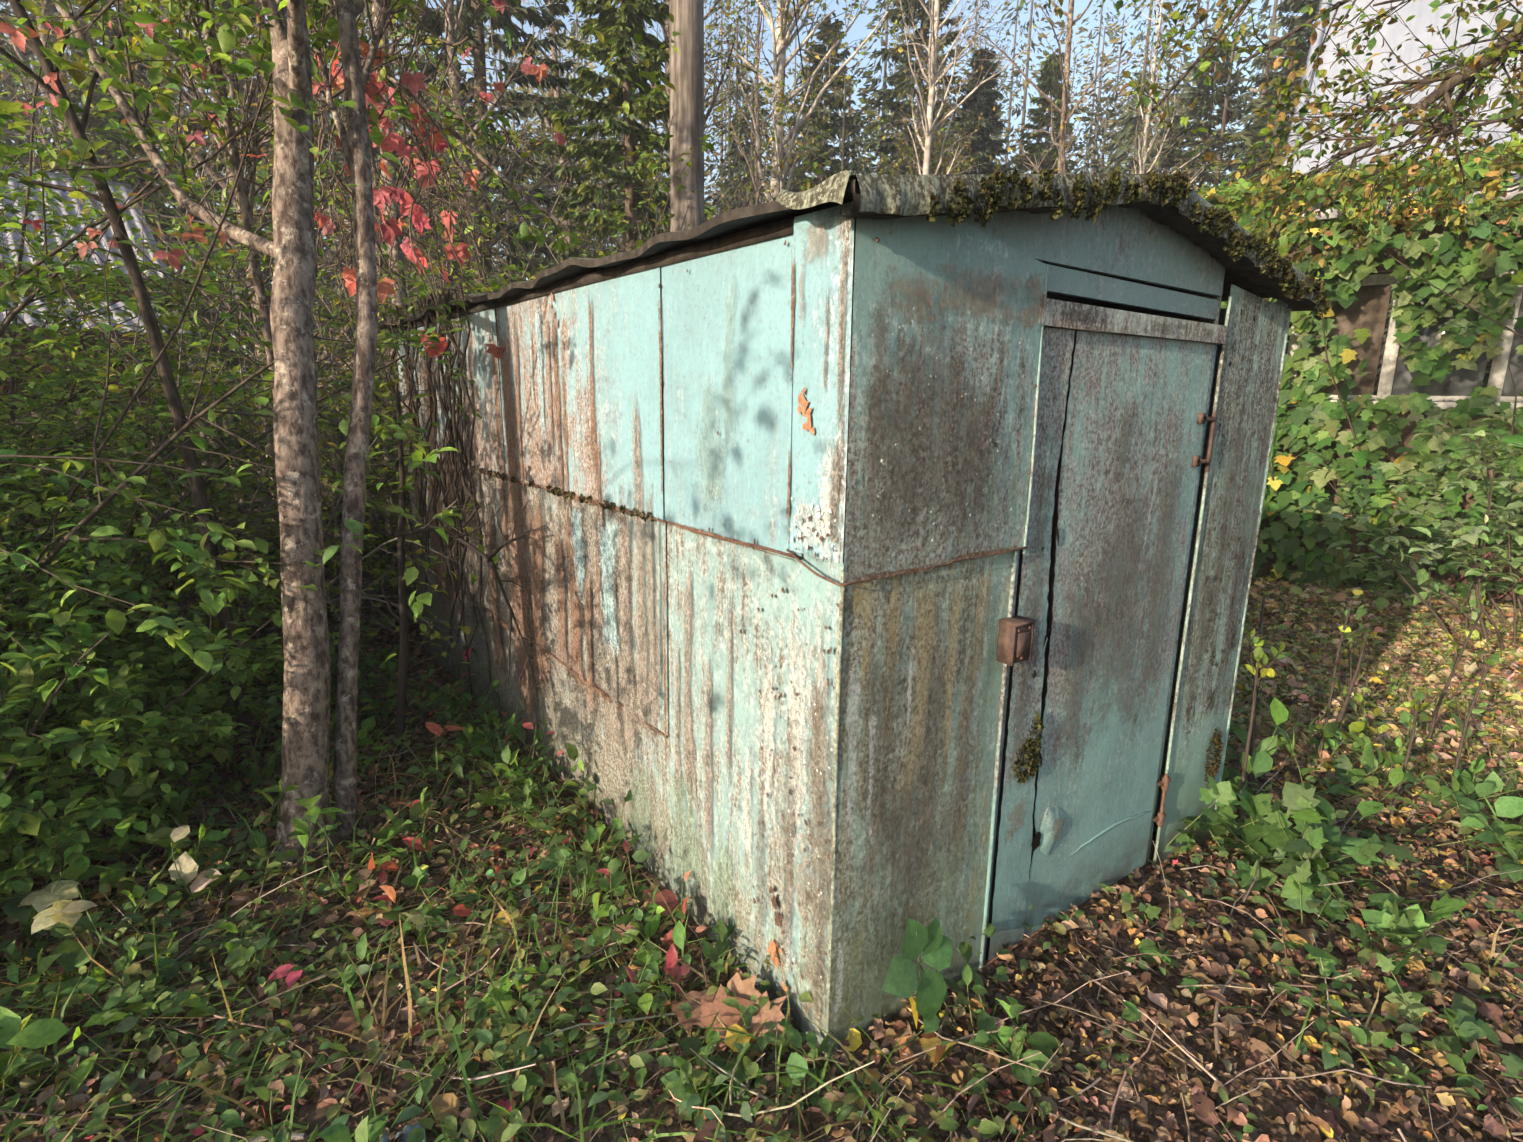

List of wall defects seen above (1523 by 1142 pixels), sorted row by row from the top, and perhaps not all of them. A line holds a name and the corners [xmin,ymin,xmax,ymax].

rust [790,250,815,435]
rust [457,293,667,769]
rust [666,453,836,562]
peeling [791,497,836,550]
damp [943,579,987,745]
rust [767,940,788,993]